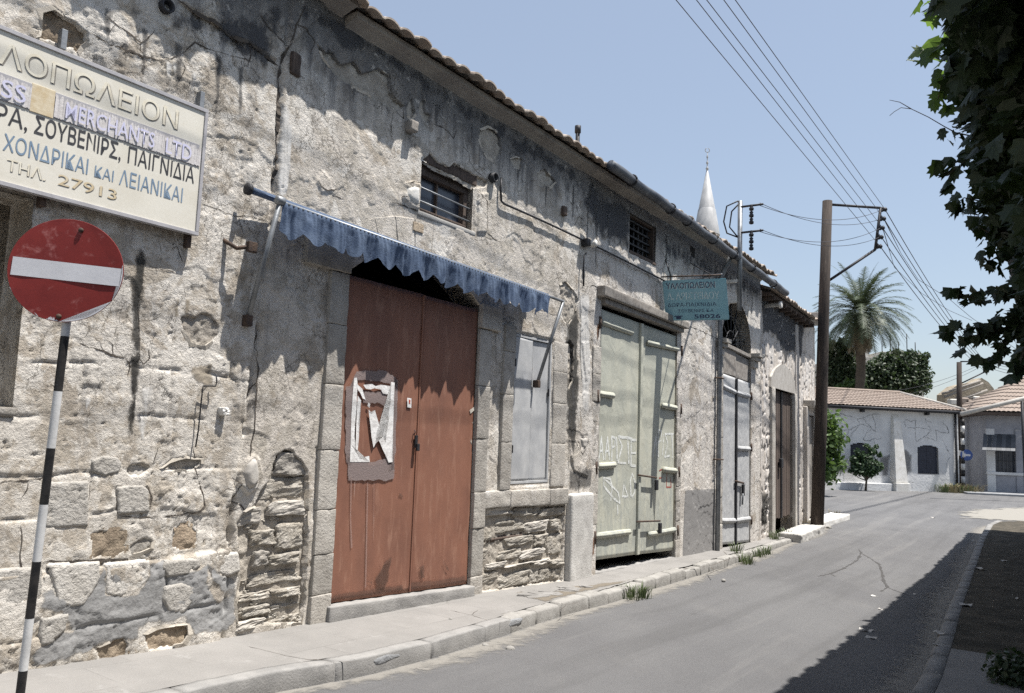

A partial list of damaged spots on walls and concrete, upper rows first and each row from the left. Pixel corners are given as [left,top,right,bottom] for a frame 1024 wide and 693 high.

leakage [304,7,429,88]
crack [92,0,315,184]
spalling [424,161,485,190]
crack [80,306,164,374]
flaking render [0,453,204,645]
spalling [144,506,286,649]
crack [820,550,910,596]
spalling [94,638,130,659]